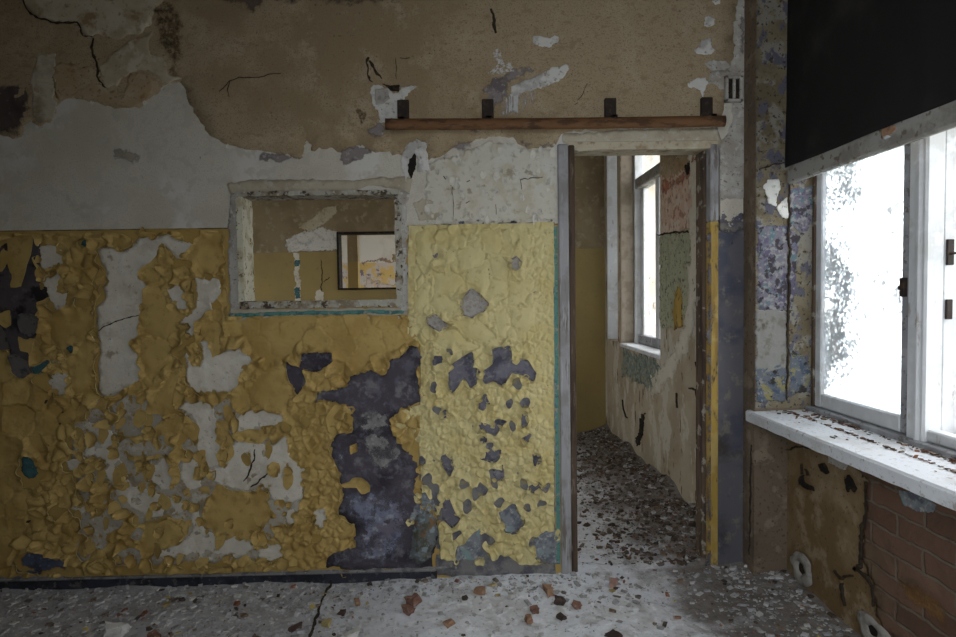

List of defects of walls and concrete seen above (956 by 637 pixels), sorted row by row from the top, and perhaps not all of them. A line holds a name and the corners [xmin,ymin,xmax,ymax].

crack [22,0,106,88]
peeling [0,0,815,579]
crack [833,481,876,607]
flaking render [844,465,956,637]